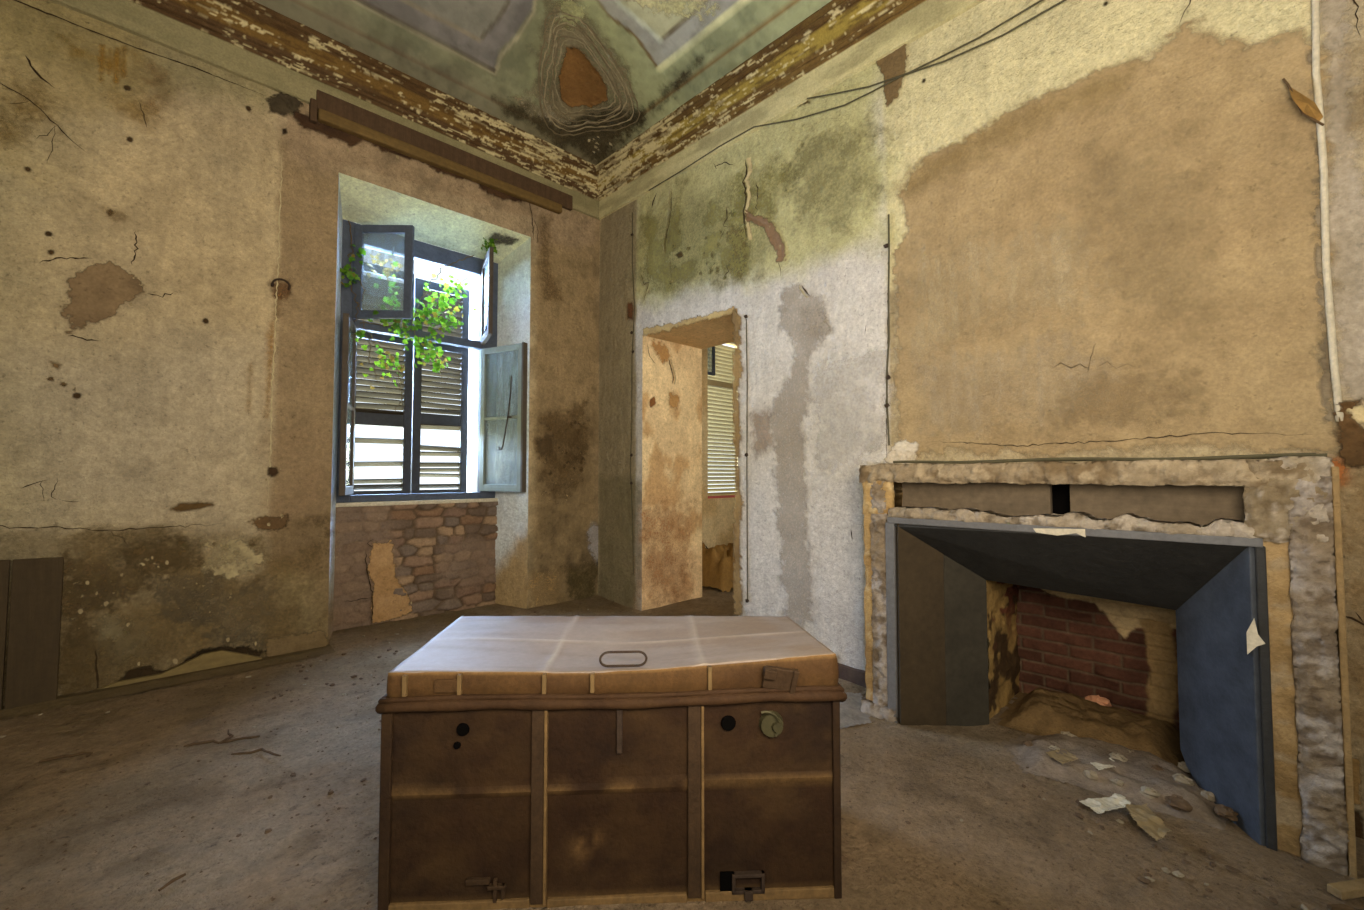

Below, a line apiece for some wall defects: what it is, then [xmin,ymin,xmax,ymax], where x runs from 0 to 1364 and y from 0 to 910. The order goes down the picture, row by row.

spalling [267,92,523,202]
leakage [504,0,703,164]
flaking render [876,44,909,107]
spalling [39,232,174,341]
flaking render [884,20,1364,468]
peeling [770,285,830,625]
leakage [58,521,334,695]